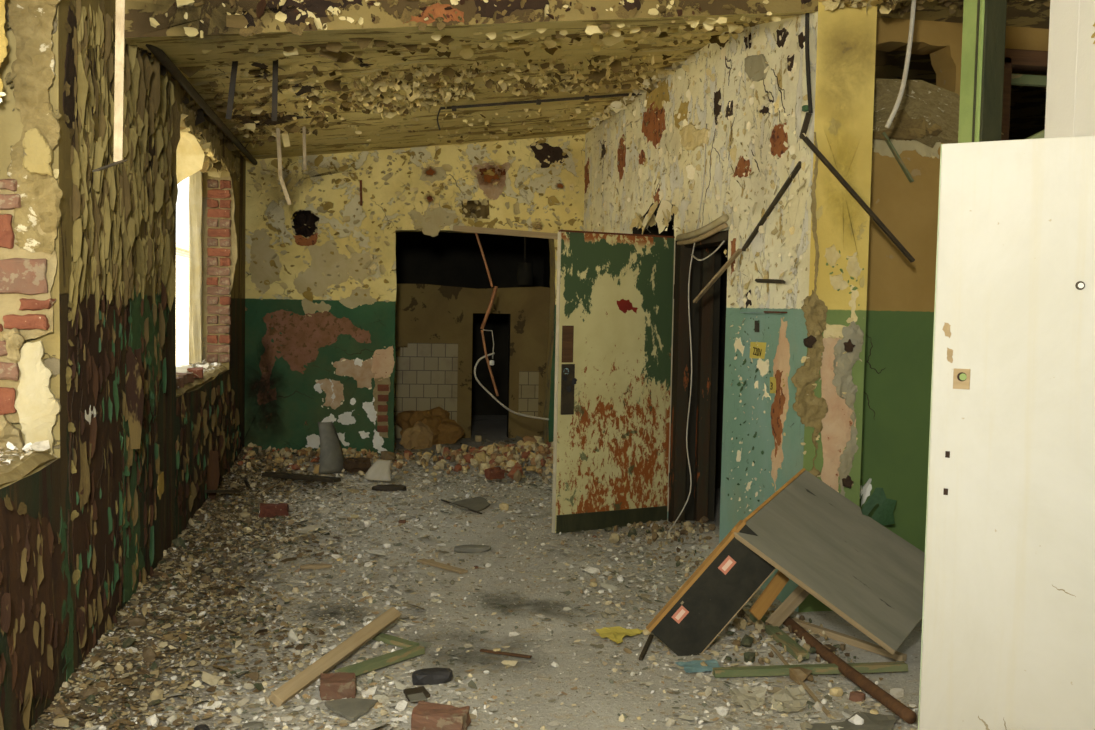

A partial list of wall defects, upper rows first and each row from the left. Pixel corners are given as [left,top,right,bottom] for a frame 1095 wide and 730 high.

peeling [801,0,964,18]
spalling [872,78,960,159]
peeling [942,322,953,363]
spalling [729,244,897,526]